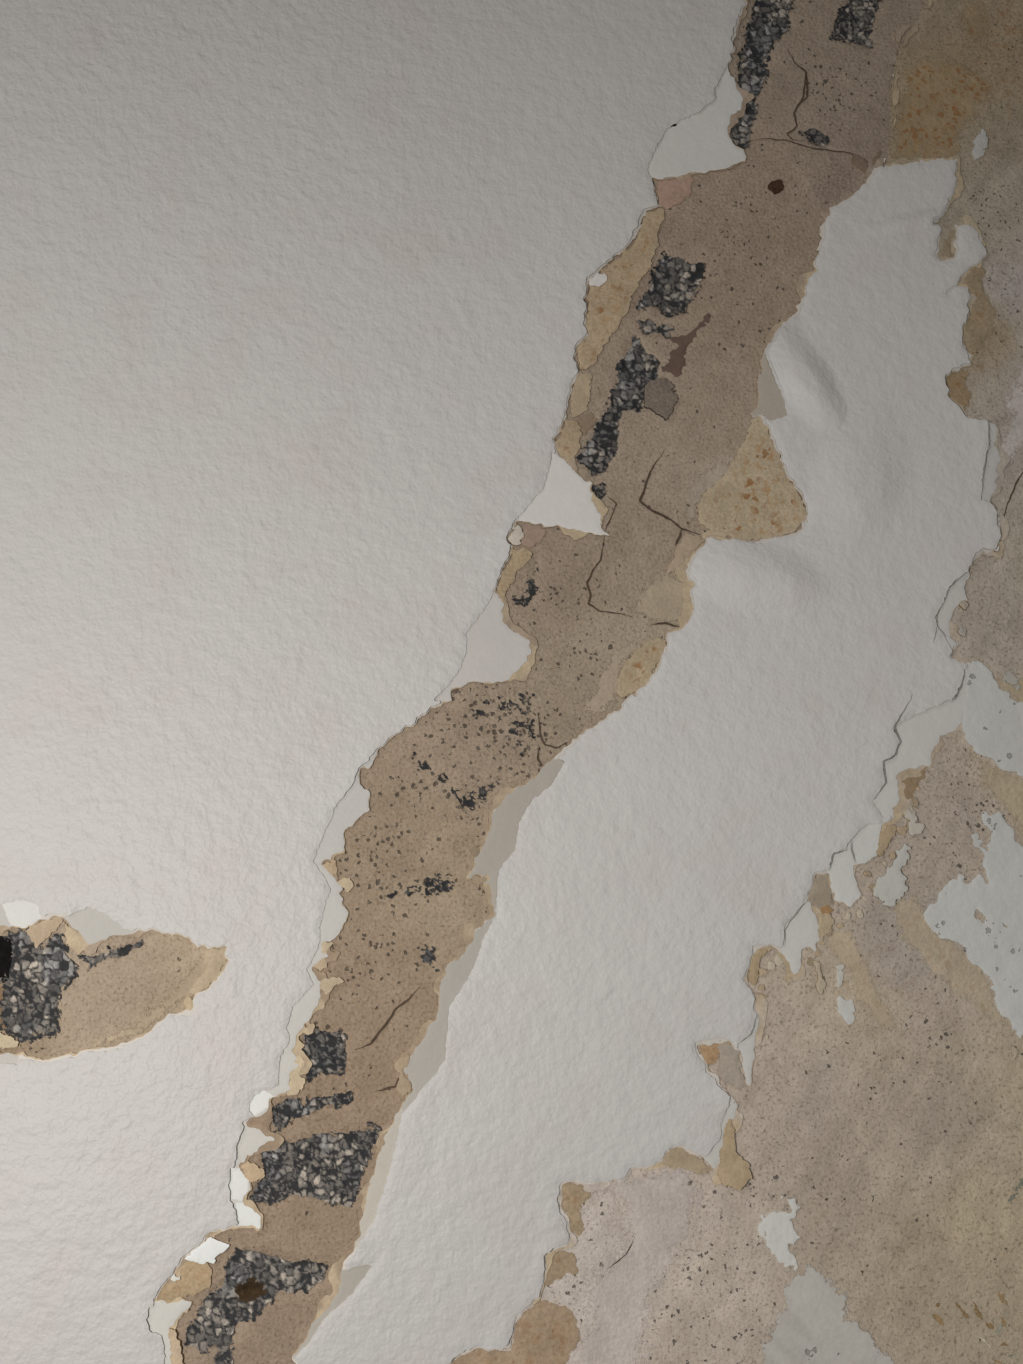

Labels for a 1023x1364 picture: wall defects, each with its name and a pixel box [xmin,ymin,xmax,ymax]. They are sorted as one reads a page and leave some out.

crack [750,50,853,155]
crack [586,451,699,627]
peeling [146,0,927,1364]
peeling [0,900,230,1065]